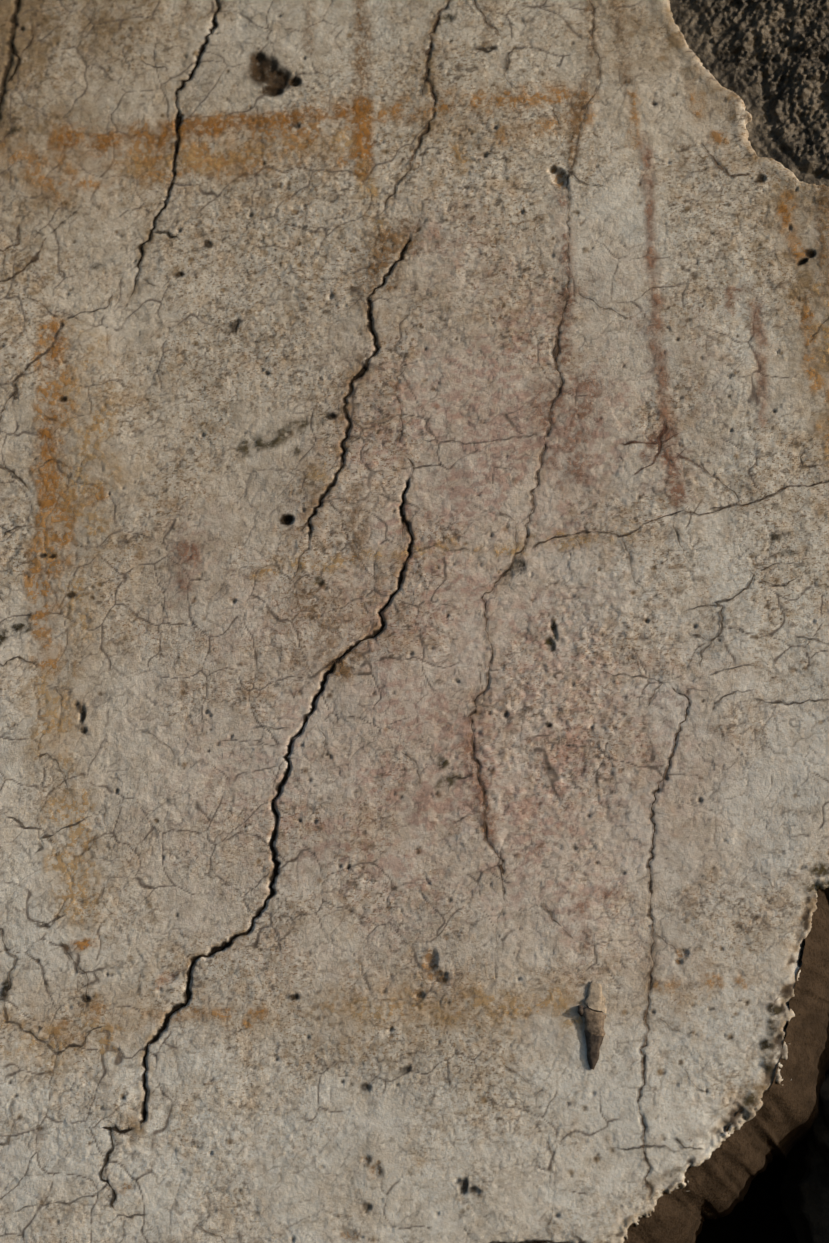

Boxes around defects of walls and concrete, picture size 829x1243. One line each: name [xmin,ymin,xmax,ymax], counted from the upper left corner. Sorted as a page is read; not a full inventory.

crack [0,0,220,433]
corrosion [96,104,357,180]
crack [384,0,522,209]
corrosion [470,89,594,108]
flaking render [669,0,829,187]
corrosion [25,321,111,669]
crack [294,223,419,579]
crack [452,2,829,897]
crack [58,375,508,1242]
crack [604,563,821,1197]
crack [490,1210,587,1243]
spalling [623,888,829,1243]